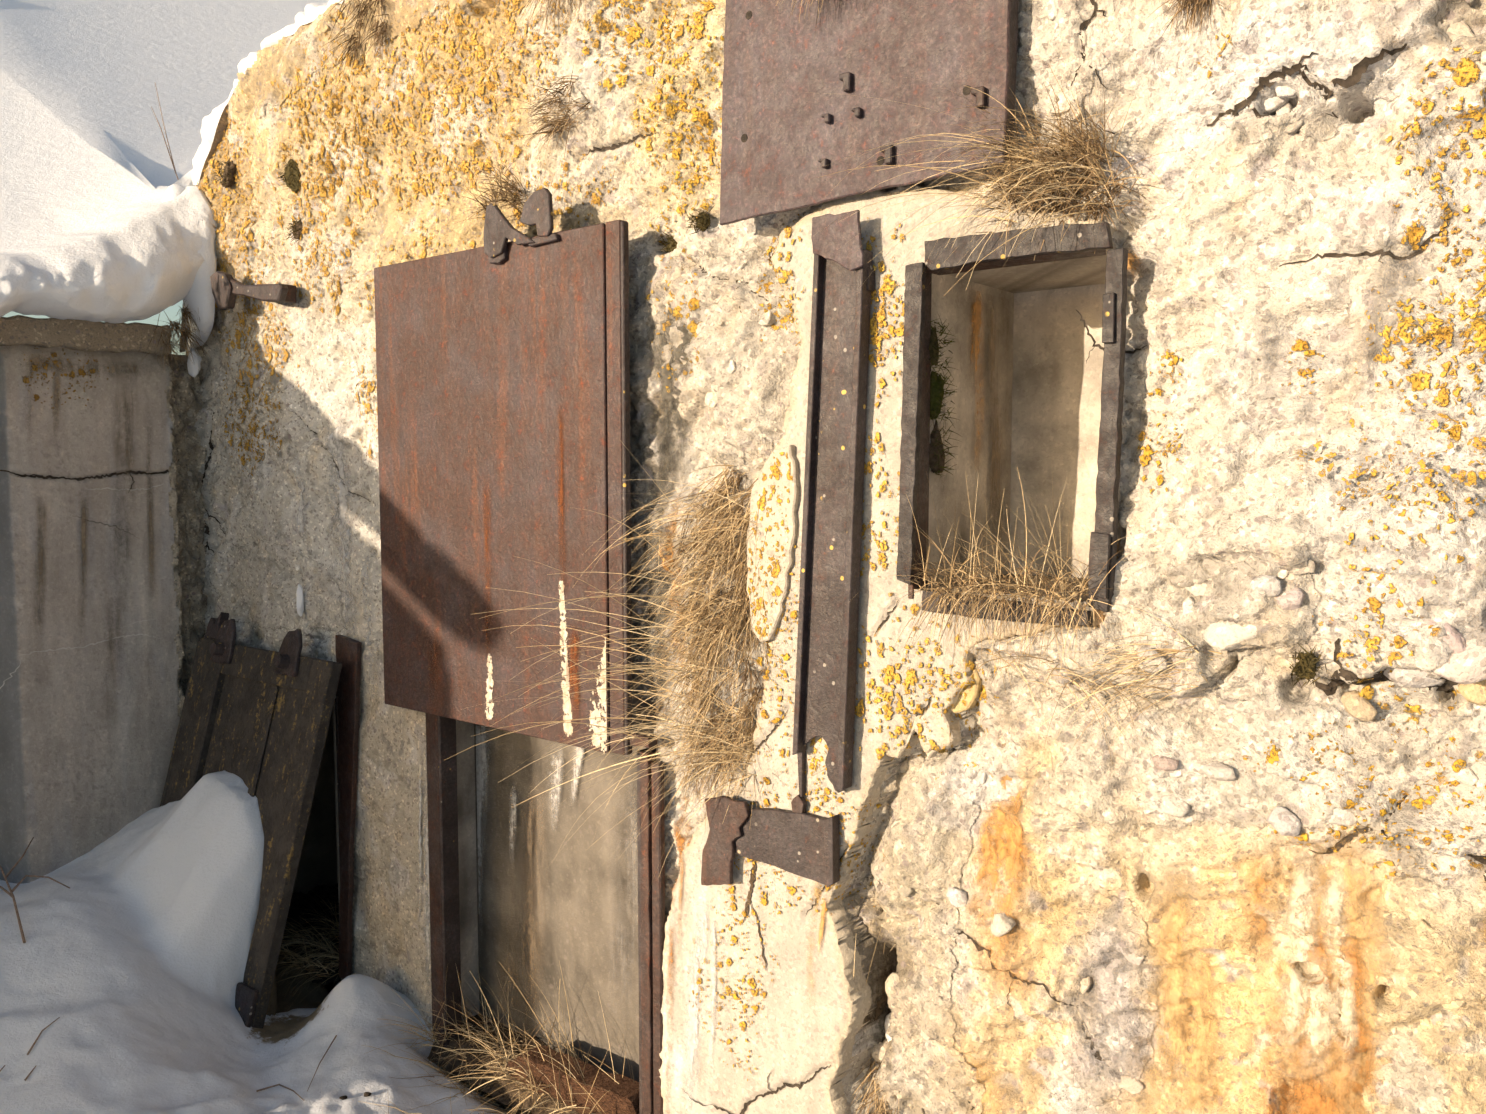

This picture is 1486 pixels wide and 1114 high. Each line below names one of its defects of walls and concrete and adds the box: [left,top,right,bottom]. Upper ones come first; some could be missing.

crack [1207,44,1407,127]
crack [1279,218,1453,267]
rust [976,775,1025,966]
crack [681,1065,831,1114]
rust [1154,896,1216,1108]
rust [1265,864,1380,1114]